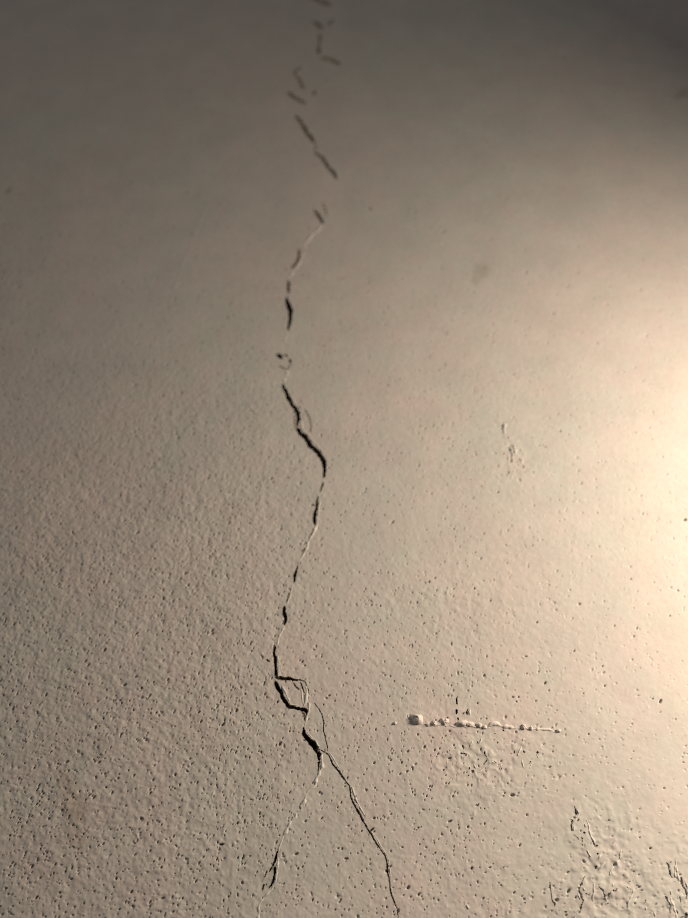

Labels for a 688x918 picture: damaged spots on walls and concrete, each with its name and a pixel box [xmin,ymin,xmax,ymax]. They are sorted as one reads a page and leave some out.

crack [287,0,340,180]
crack [257,203,399,918]